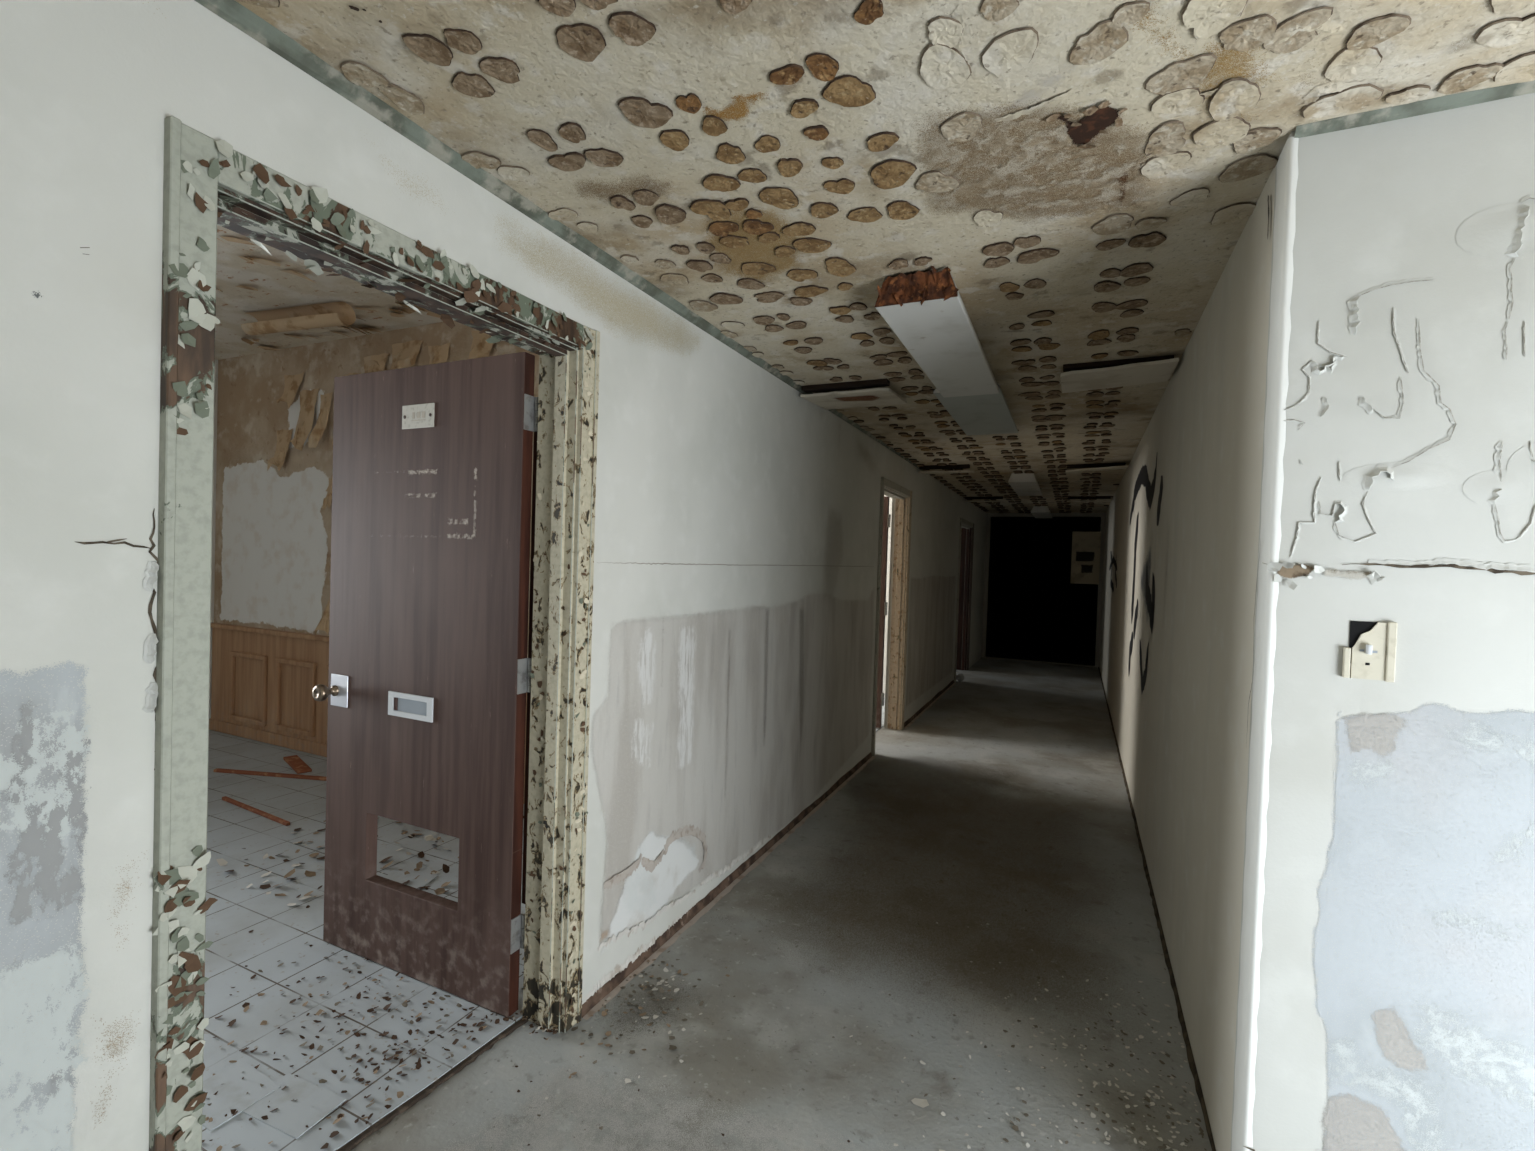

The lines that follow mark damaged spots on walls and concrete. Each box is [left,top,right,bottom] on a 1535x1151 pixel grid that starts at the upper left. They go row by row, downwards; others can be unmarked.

peeling [1347,278,1433,335]
peeling [1501,194,1535,360]
peeling [1267,308,1457,590]
peeling [1486,441,1535,543]
crack [77,508,159,721]
peeling [562,524,593,650]
crack [1342,558,1535,575]
peeling [560,670,587,743]
peeling [556,781,588,884]
peeling [503,899,582,1040]